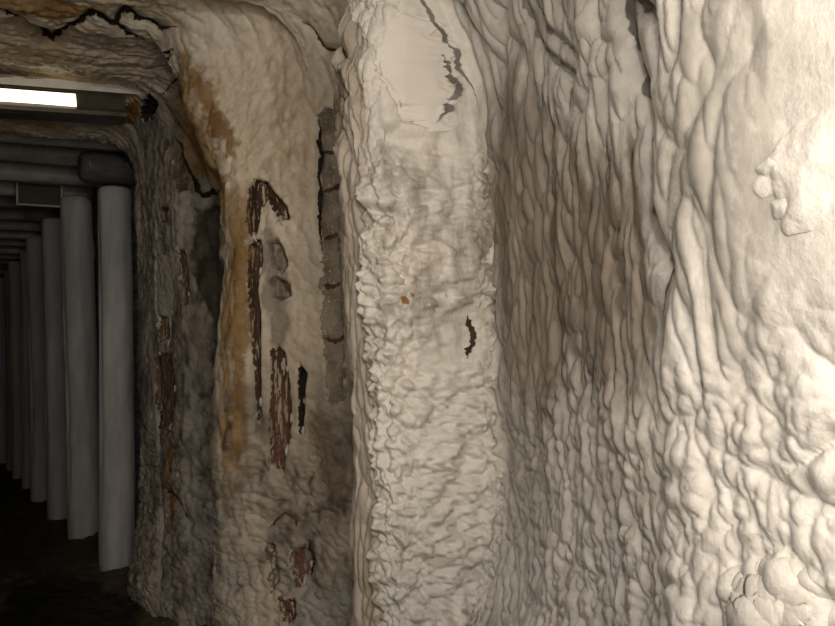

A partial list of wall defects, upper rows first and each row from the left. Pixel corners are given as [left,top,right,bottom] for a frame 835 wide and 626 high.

water stain [190,206,224,363]
spalling [244,178,304,475]
spalling [317,66,349,403]
crack [439,54,463,120]
water stain [473,64,657,407]
water stain [668,0,768,350]